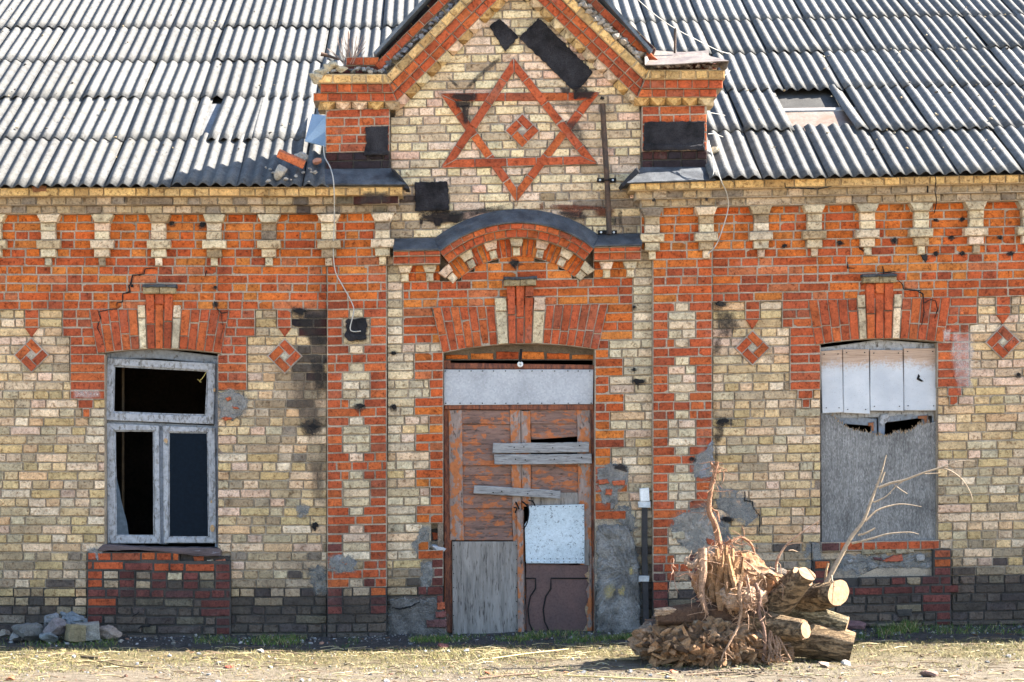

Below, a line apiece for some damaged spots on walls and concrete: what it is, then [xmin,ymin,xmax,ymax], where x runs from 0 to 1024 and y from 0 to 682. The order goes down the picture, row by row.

crack [97,268,155,339]